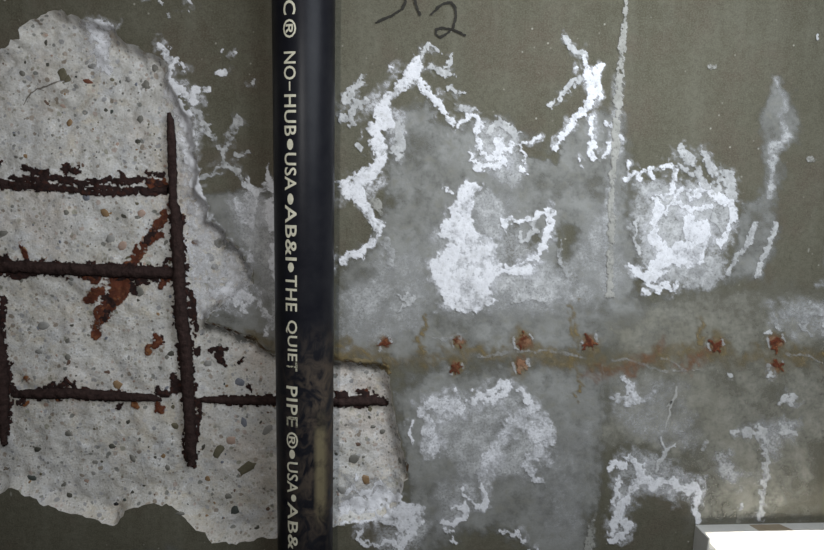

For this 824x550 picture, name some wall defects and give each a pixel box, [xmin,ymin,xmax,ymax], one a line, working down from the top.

water stain [82,19,114,75]
water stain [157,40,275,352]
corrosion [123,202,170,266]
corrosion [83,277,138,341]
spalling [0,9,277,545]
corrosion [144,333,165,356]
corrosion [208,345,229,368]
crack [205,323,274,356]
crack [334,354,391,374]
water stain [334,35,824,550]
corrosion [442,305,734,377]
spalling [333,360,408,527]